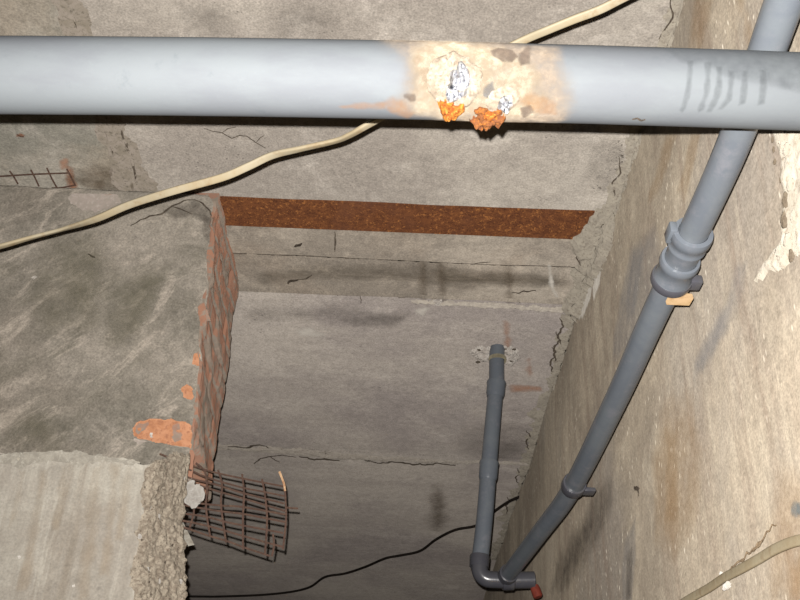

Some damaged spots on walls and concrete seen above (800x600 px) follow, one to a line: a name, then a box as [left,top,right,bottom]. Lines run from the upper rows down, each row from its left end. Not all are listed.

peeling [0,168,121,213]
crack [130,199,212,226]
spalling [754,130,800,283]
spalling [129,418,201,600]